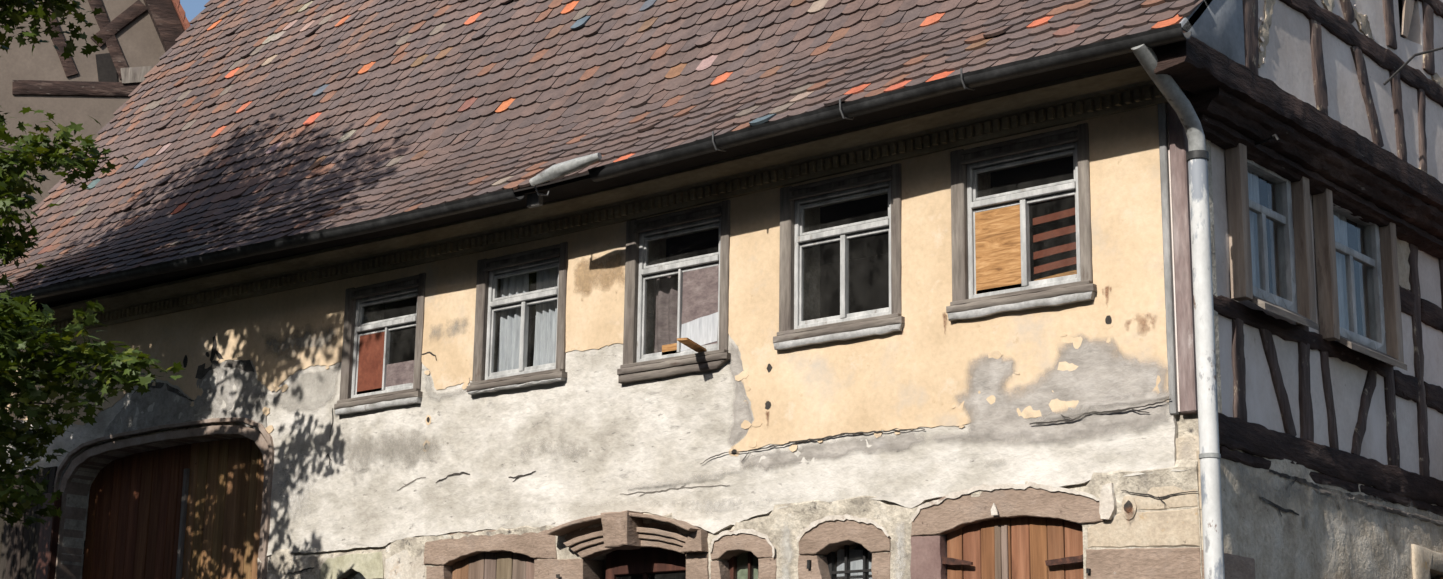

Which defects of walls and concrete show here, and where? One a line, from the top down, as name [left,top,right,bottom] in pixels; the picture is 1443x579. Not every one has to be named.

peeling [98,359,338,444]
peeling [423,370,472,452]
peeling [729,313,1167,470]
crack [624,428,925,496]
spalling [1099,483,1137,520]